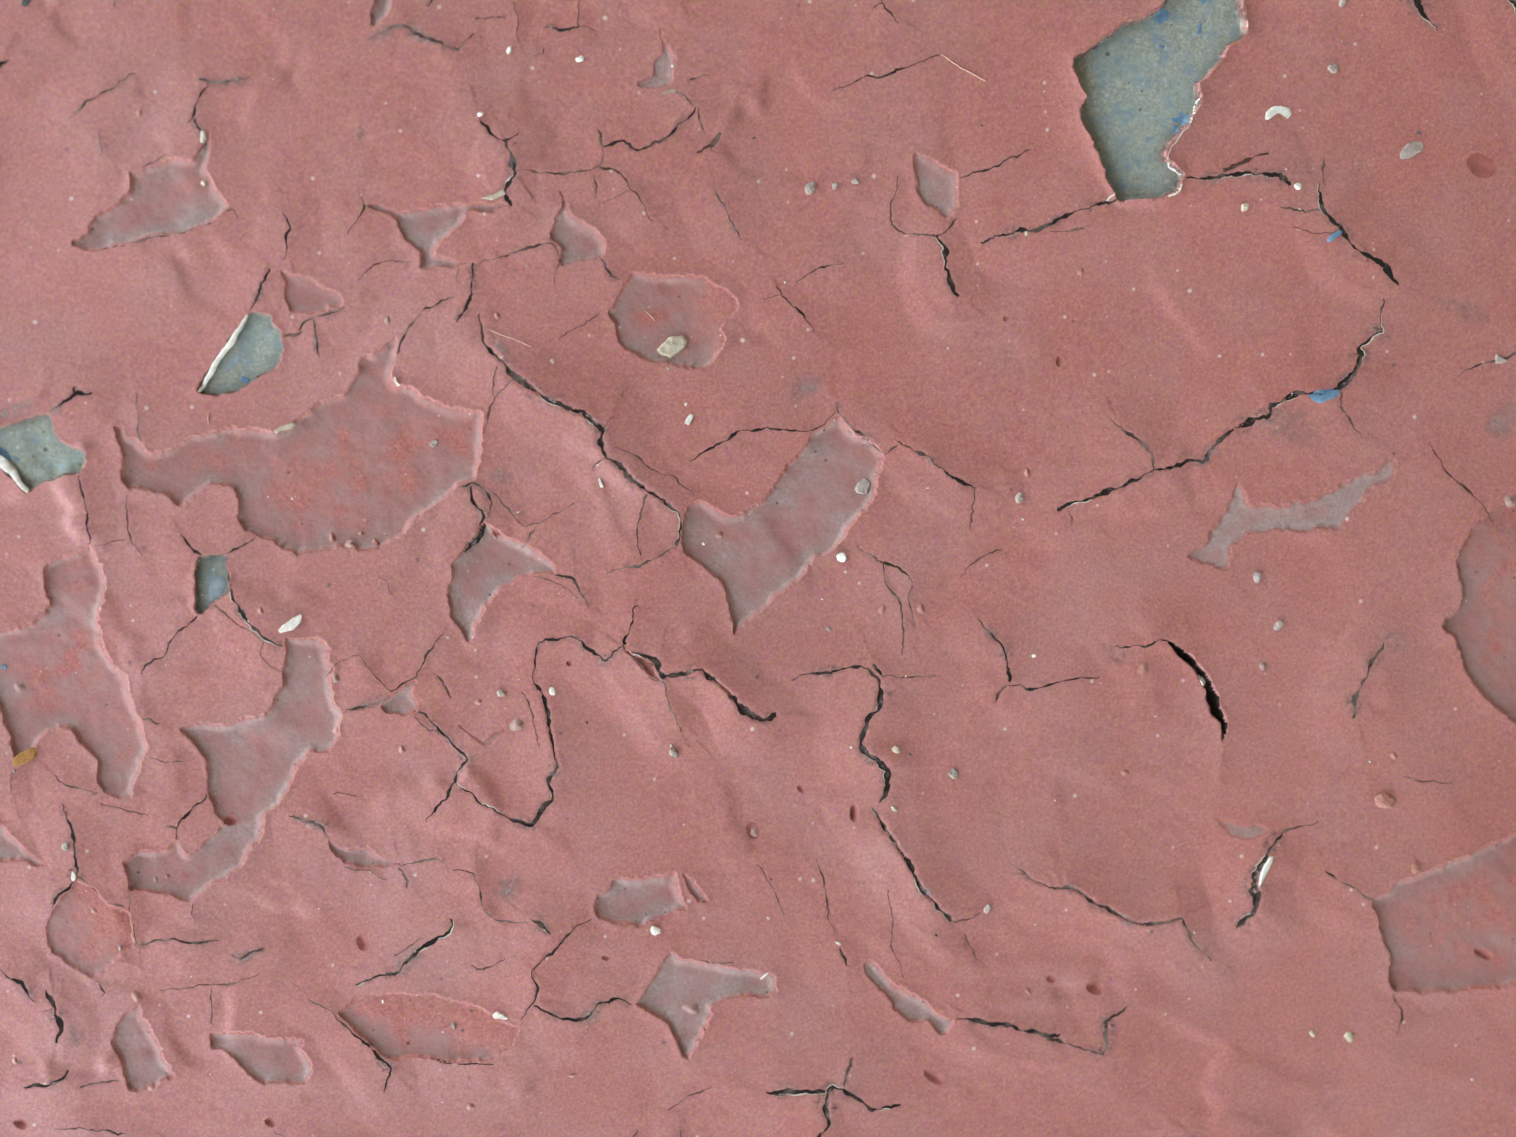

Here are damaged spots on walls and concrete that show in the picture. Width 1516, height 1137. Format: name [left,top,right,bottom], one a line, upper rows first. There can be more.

peeling [1073,0,1249,201]
crack [1408,0,1437,31]
peeling [0,414,86,493]
peeling [0,546,148,798]
peeling [194,555,230,615]
peeling [124,614,342,903]
peeling [197,312,283,396]
peeling [113,336,484,555]
peeling [448,523,556,642]
crack [283,243,1001,1092]
peeling [681,415,885,634]
crack [1057,153,1399,525]